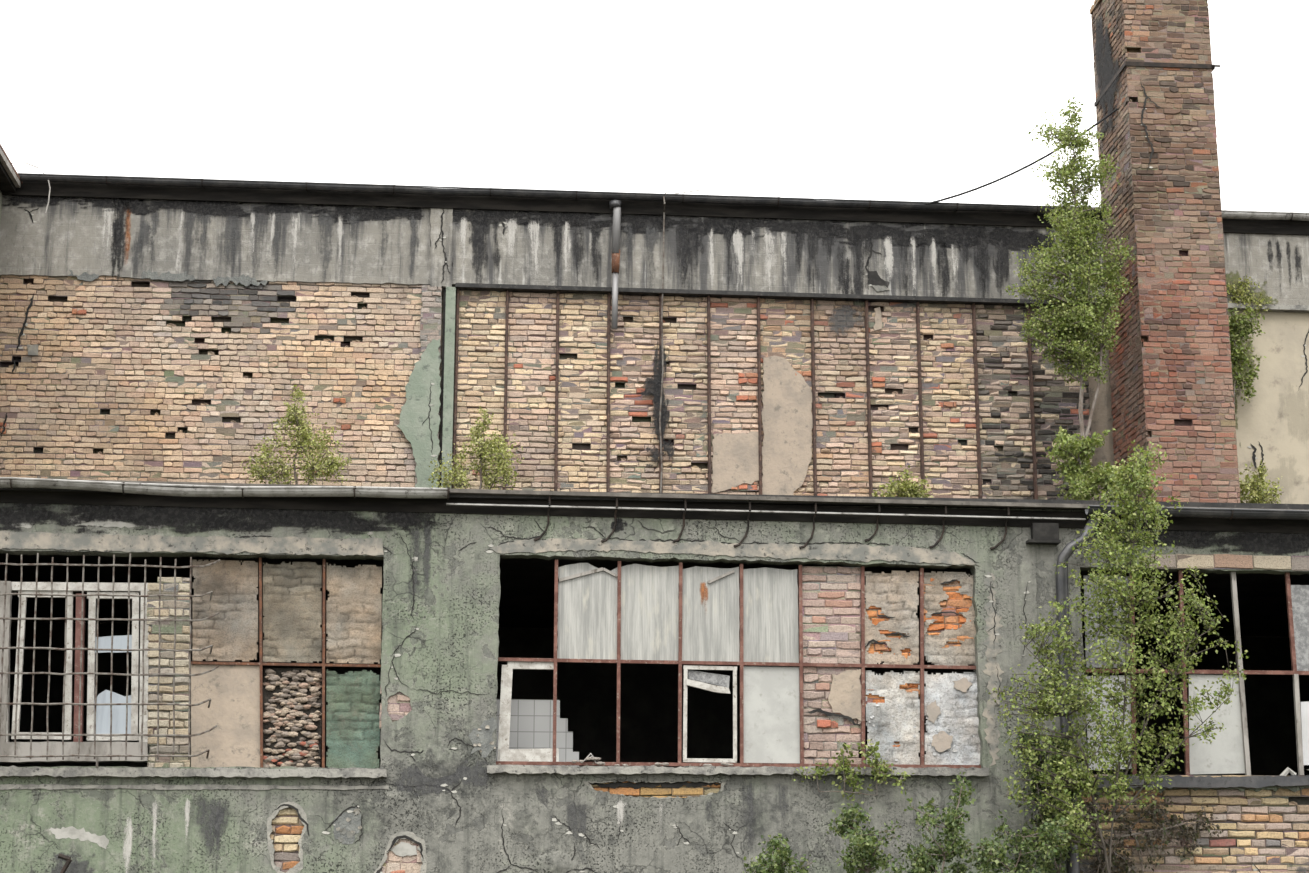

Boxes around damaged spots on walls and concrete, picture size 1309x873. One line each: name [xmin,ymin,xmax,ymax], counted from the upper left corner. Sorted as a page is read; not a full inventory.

damp [102,201,159,275]
damp [460,219,602,286]
damp [676,224,1010,303]
damp [1226,241,1302,304]
crack [1298,329,1309,391]
peeling [396,339,442,488]
crack [366,532,488,698]
spalling [267,801,309,873]
spalling [374,831,428,873]
crack [497,798,624,873]
crack [672,824,690,845]
spalling [1077,774,1309,873]